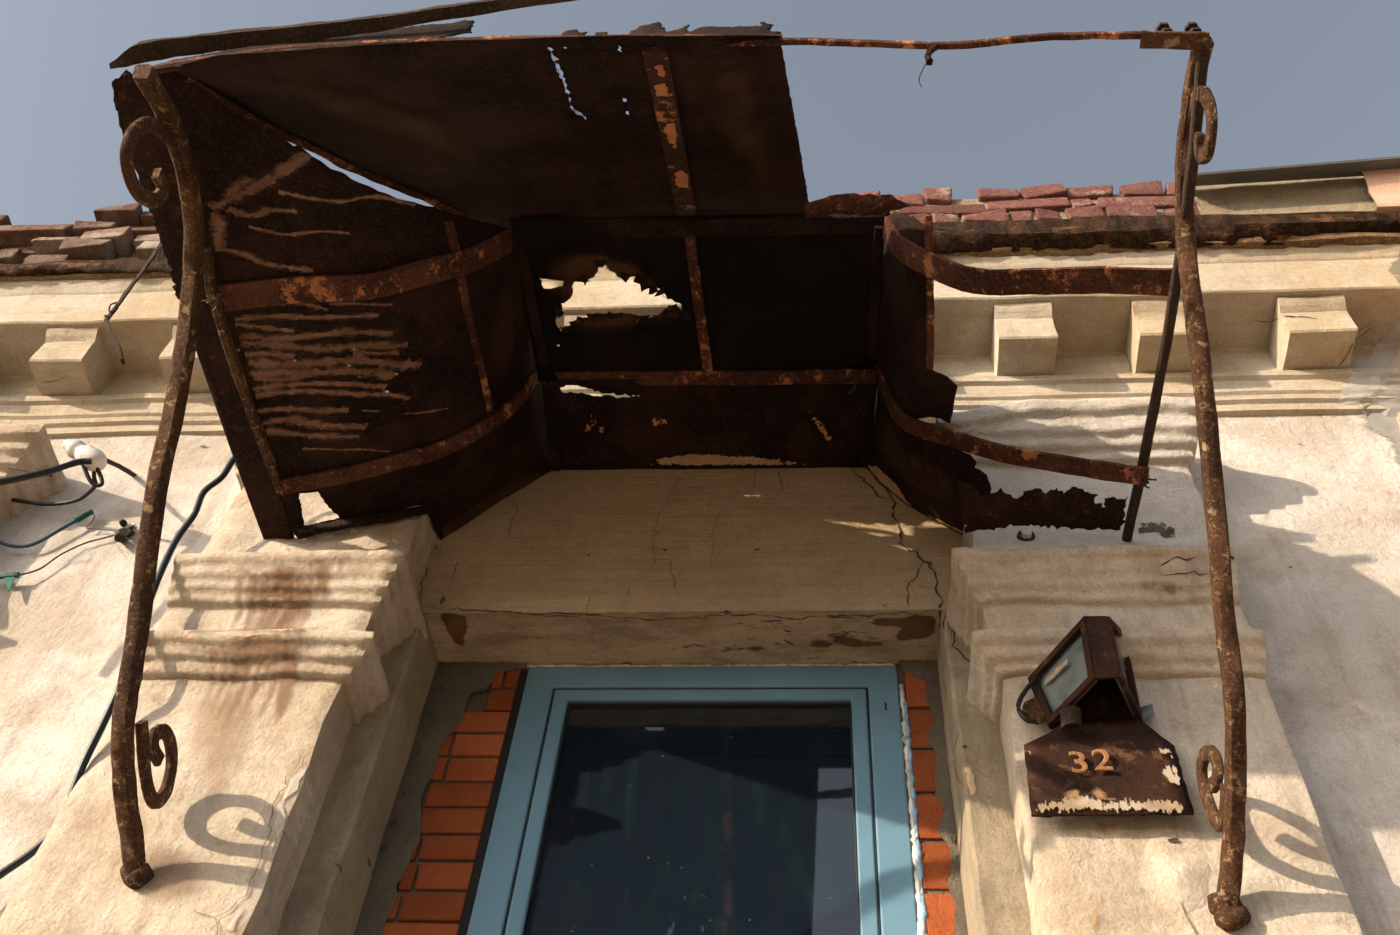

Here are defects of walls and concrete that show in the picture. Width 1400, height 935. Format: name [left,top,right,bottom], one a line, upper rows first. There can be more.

corrosion [207,151,417,273]
corrosion [551,254,677,334]
corrosion [235,301,449,453]
corrosion [200,561,326,715]
corrosion [443,467,541,537]
crack [420,466,970,662]